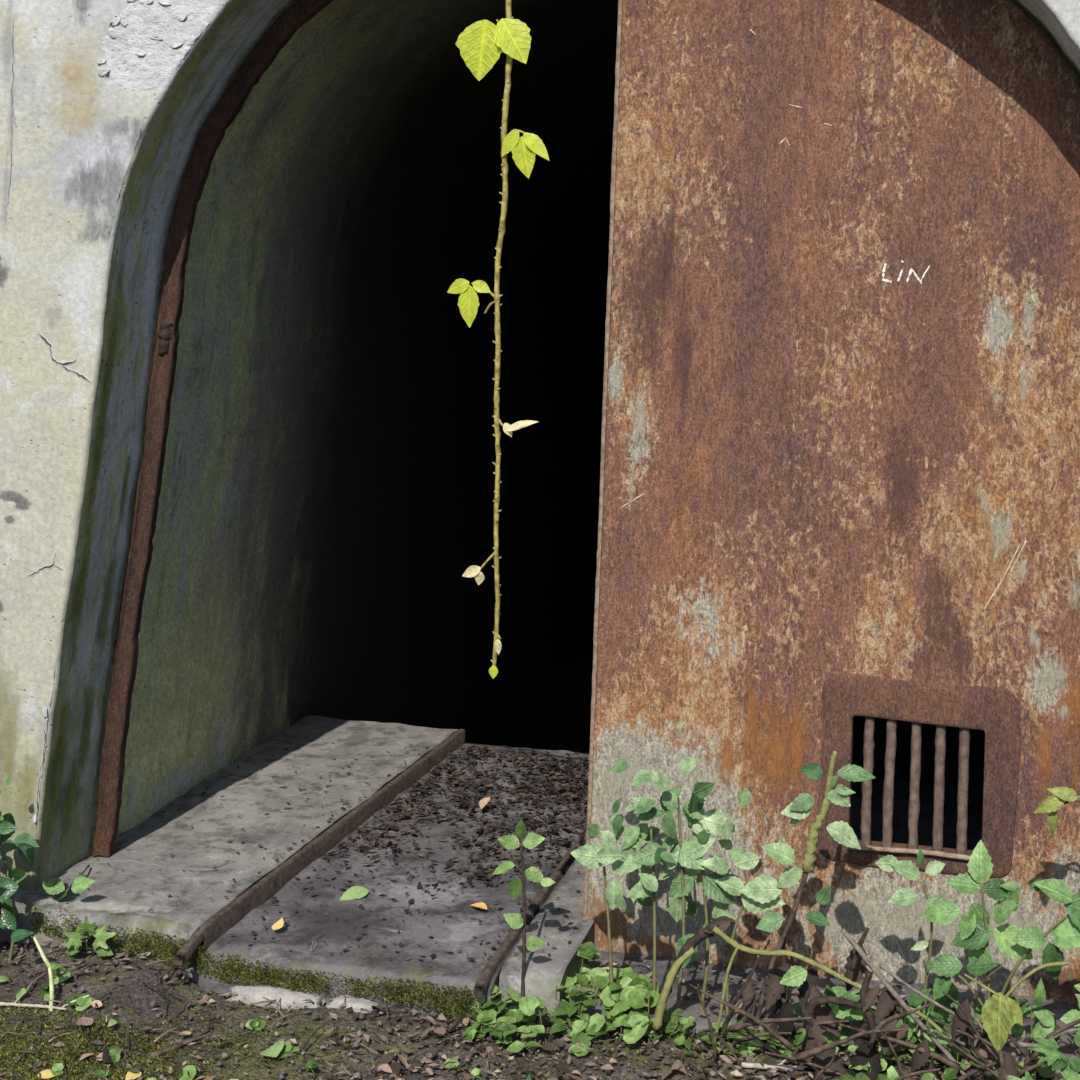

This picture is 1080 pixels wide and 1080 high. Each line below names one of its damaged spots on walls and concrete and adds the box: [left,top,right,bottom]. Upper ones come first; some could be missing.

spalling [96,0,224,93]
leakage [54,117,142,240]
crack [37,333,91,383]
leakage [0,491,29,523]
leakage [72,555,89,662]
leakage [51,690,94,833]
rust [589,898,675,956]
rust [1042,975,1080,996]